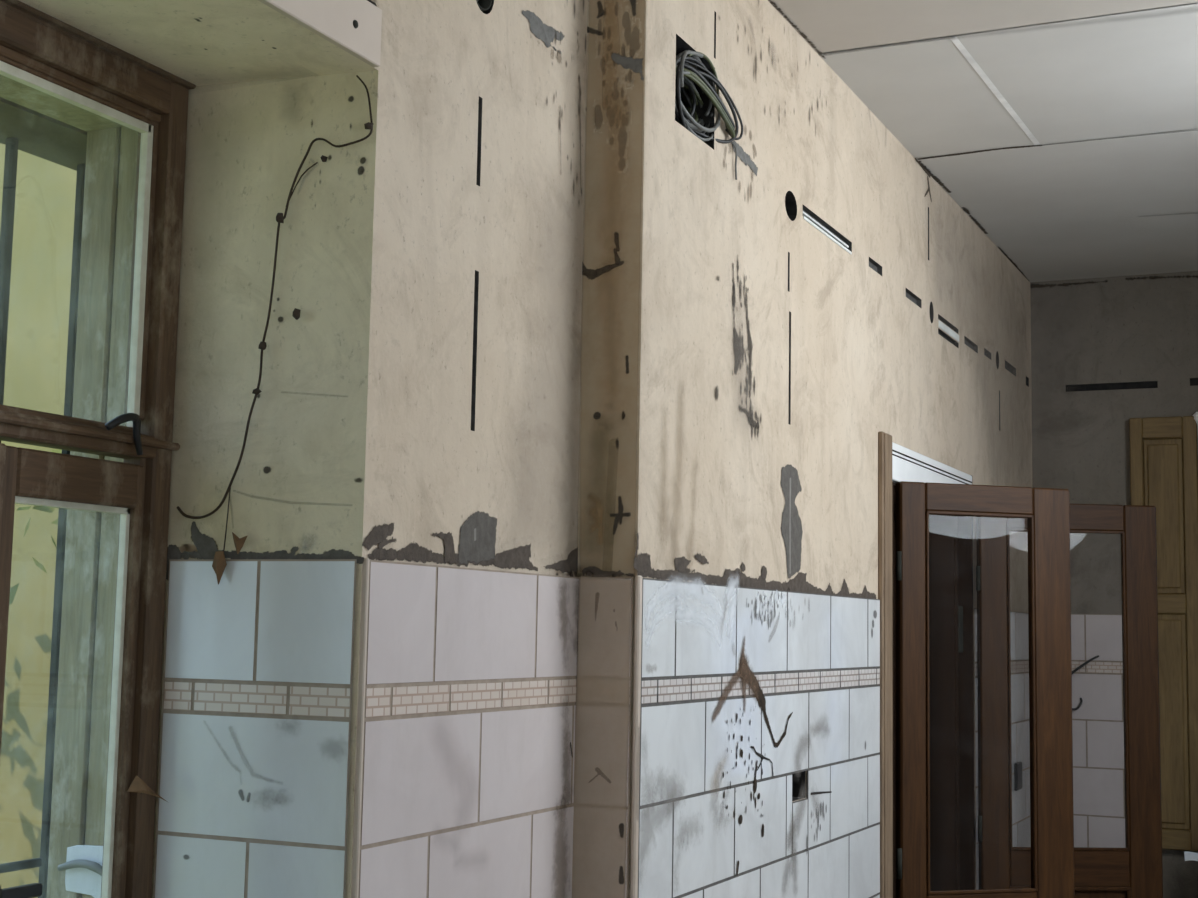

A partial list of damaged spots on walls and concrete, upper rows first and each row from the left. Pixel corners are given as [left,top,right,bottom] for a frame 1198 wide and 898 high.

damp [717,258,761,436]
peeling [166,511,876,618]